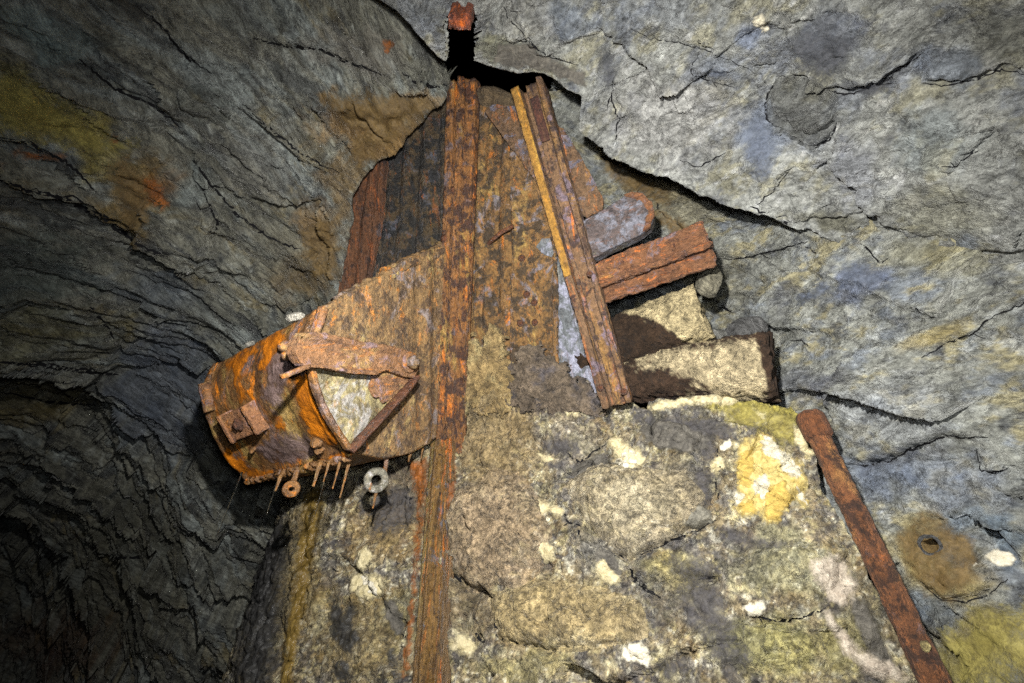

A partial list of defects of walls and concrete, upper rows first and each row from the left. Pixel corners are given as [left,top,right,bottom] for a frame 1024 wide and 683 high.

crack [829,54,921,96]
crack [925,68,1024,87]
crack [680,152,726,167]
crack [722,172,816,260]
corrosion [225,331,285,399]
corrosion [295,373,346,460]
corrosion [223,448,273,477]
corrosion [410,460,425,555]